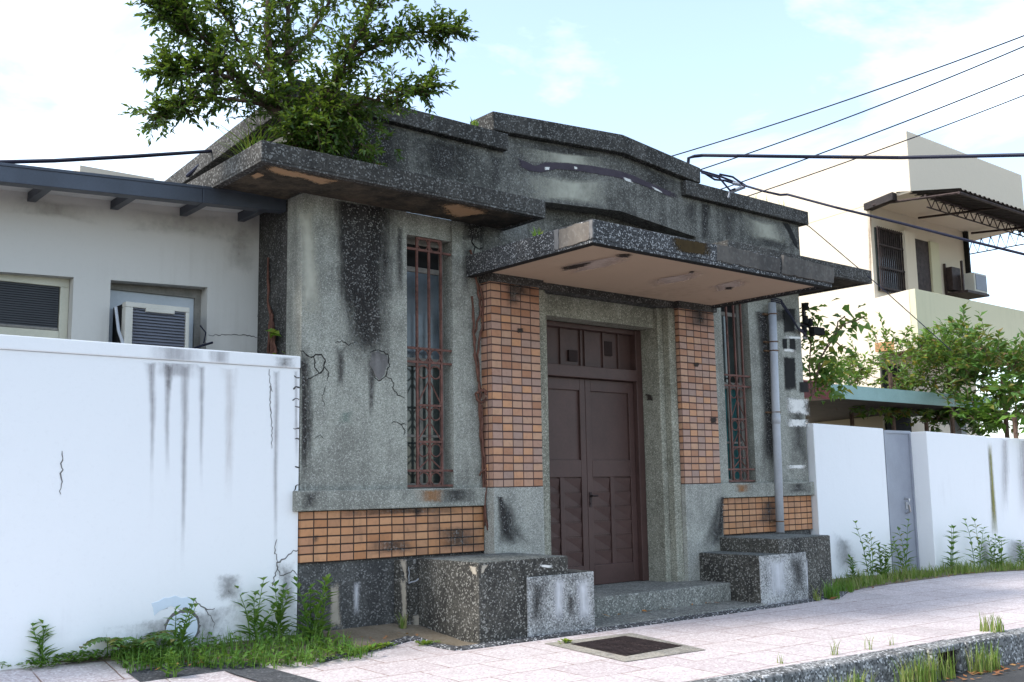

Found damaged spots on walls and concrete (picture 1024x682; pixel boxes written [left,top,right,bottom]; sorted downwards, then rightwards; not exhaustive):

flaking render [252,167,337,184]
leakage [341,202,401,345]
crack [269,340,355,445]
leakage [498,497,518,538]
crack [272,540,299,586]